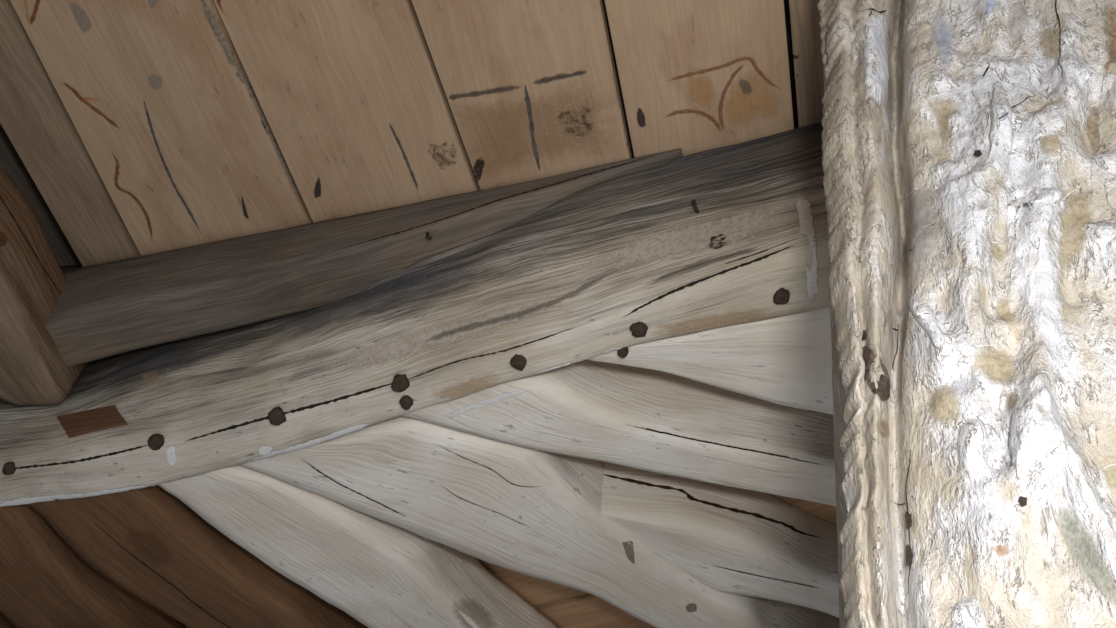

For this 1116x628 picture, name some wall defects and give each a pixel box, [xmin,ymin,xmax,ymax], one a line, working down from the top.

crack [184,328,572,442]
crack [15,445,147,469]
crack [442,447,540,487]
crack [625,424,821,465]
crack [303,460,404,516]
crack [442,486,526,526]
crack [603,474,821,538]